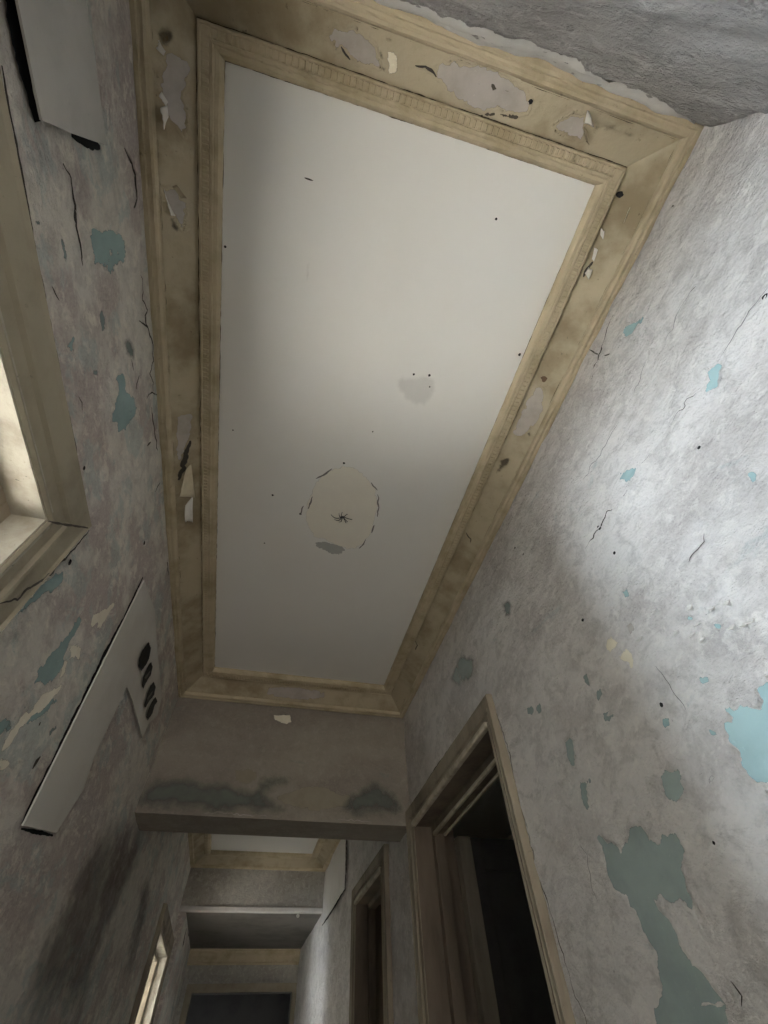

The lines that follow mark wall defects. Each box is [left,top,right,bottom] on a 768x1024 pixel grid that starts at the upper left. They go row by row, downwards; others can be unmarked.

peeling [322,21,397,74]
peeling [153,40,193,141]
peeling [431,54,534,118]
crack [63,163,83,265]
crack [124,147,139,209]
crack [131,276,158,450]
peeling [501,383,547,457]
crack [586,490,627,547]
peeling [718,675,768,796]
water stain [144,780,278,811]
water stain [346,785,398,812]
peeling [594,819,736,1024]